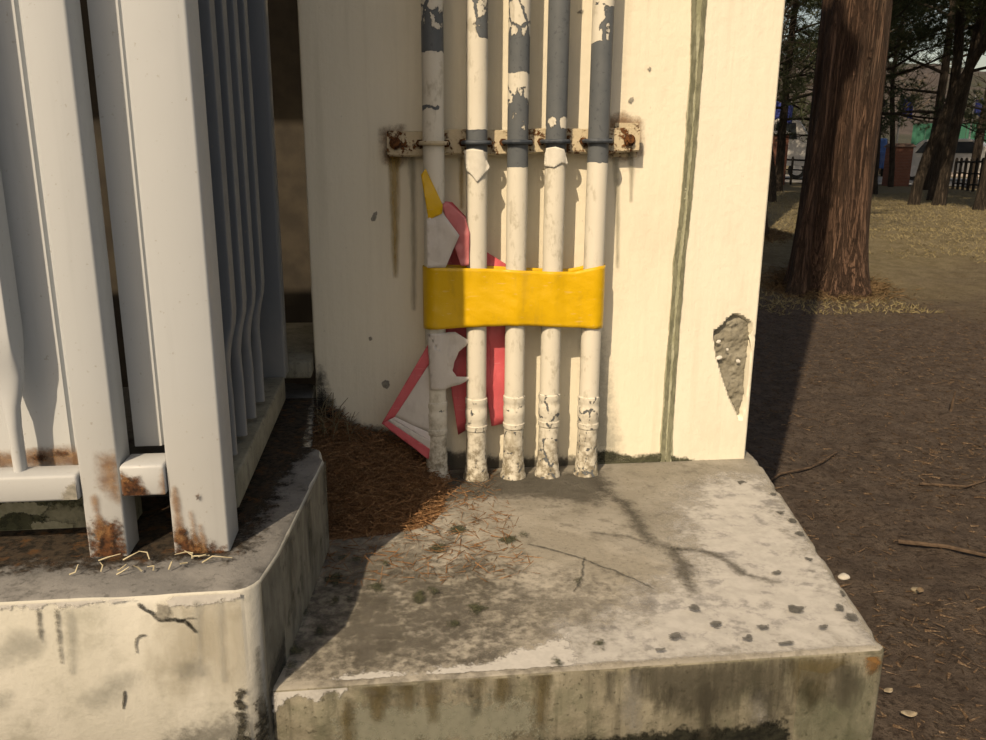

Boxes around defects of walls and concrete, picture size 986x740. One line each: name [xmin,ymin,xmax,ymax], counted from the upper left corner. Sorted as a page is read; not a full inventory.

rust [384,132,404,273]
spalling [714,314,749,415]
rust [26,449,78,466]
rust [101,458,150,496]
rust [86,497,127,557]
rust [163,480,225,554]
crack [530,544,653,591]
crack [134,603,197,653]
water stain [180,460,330,740]
water stain [366,686,387,718]
water stain [536,675,550,721]
water stain [629,659,844,736]